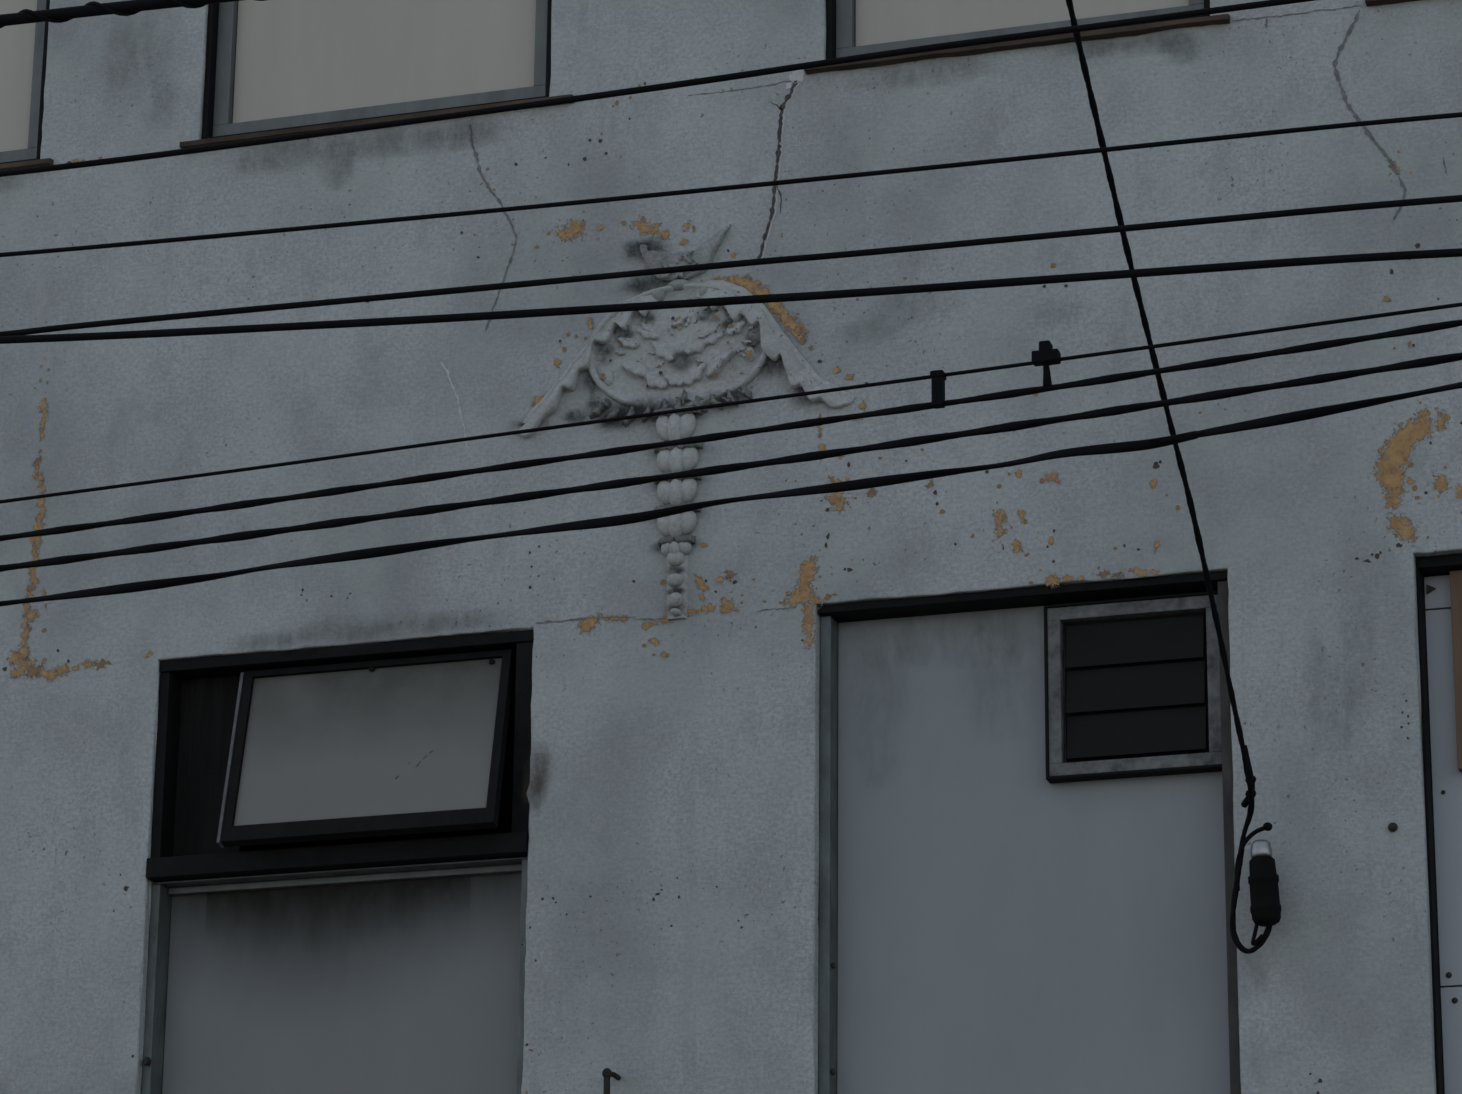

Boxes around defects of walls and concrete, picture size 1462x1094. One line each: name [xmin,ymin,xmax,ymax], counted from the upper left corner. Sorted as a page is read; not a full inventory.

crack [469,124,518,331]
peeling [534,210,696,249]
crack [688,80,800,259]
crack [1233,5,1406,221]
peeling [701,249,869,421]
peeling [2,356,111,682]
peeling [574,570,756,658]
peeling [763,533,837,650]
peeling [954,469,1160,588]
peeling [1149,460,1181,511]
peeling [1355,401,1462,563]